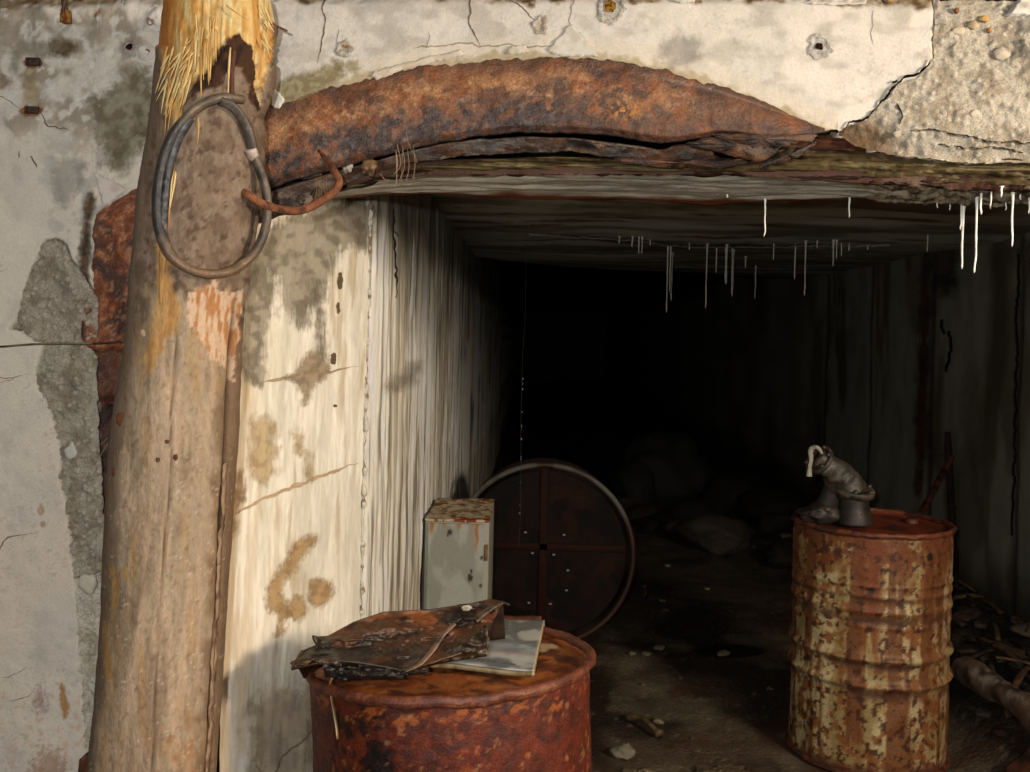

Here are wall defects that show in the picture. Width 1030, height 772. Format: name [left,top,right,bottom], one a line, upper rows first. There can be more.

crack [0,96,69,130]
water stain [49,38,77,57]
water stain [89,68,152,170]
rust [614,133,817,170]
spalling [839,0,1030,164]
water stain [78,193,96,286]
spalling [13,238,104,749]
water stain [232,415,278,537]
water stain [295,435,314,478]
water stain [267,536,335,637]